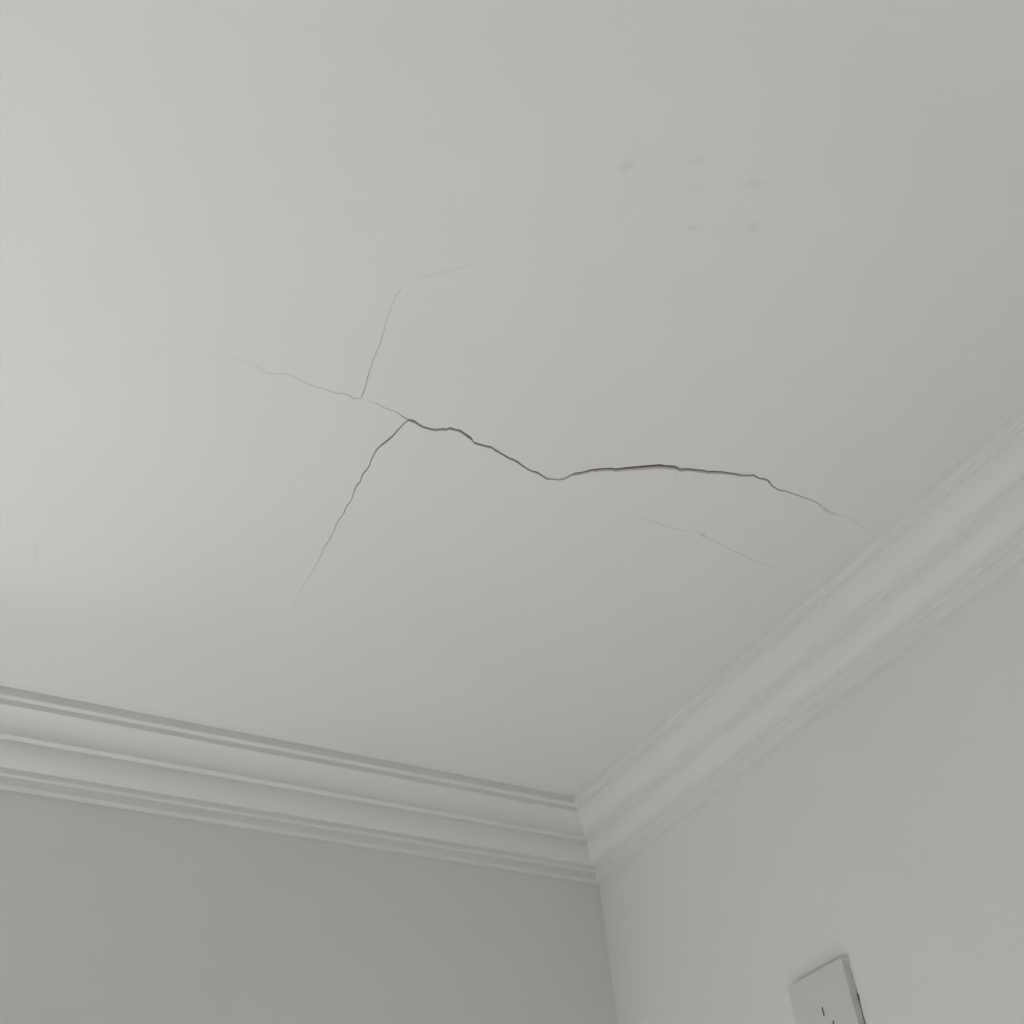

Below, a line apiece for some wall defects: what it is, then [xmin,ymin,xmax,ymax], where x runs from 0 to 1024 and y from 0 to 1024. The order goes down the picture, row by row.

crack [321,408,832,555]